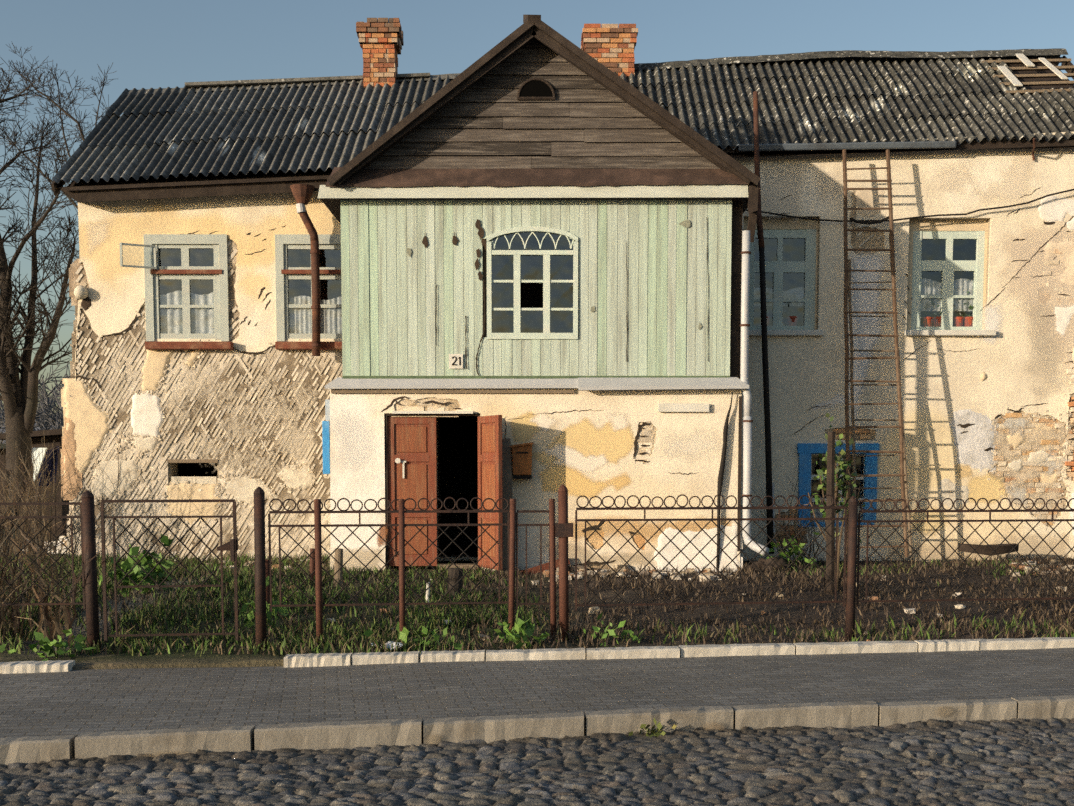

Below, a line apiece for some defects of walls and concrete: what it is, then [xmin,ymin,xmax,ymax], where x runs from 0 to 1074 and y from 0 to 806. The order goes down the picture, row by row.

crack [982,216,1073,309]
spalling [81,296,91,313]
flaking render [984,230,1074,536]
flaking render [60,349,174,500]
flaking render [166,476,278,525]
flaking render [277,465,313,490]
peeling [530,414,557,431]
peeling [545,444,607,472]
flaking render [607,413,657,465]